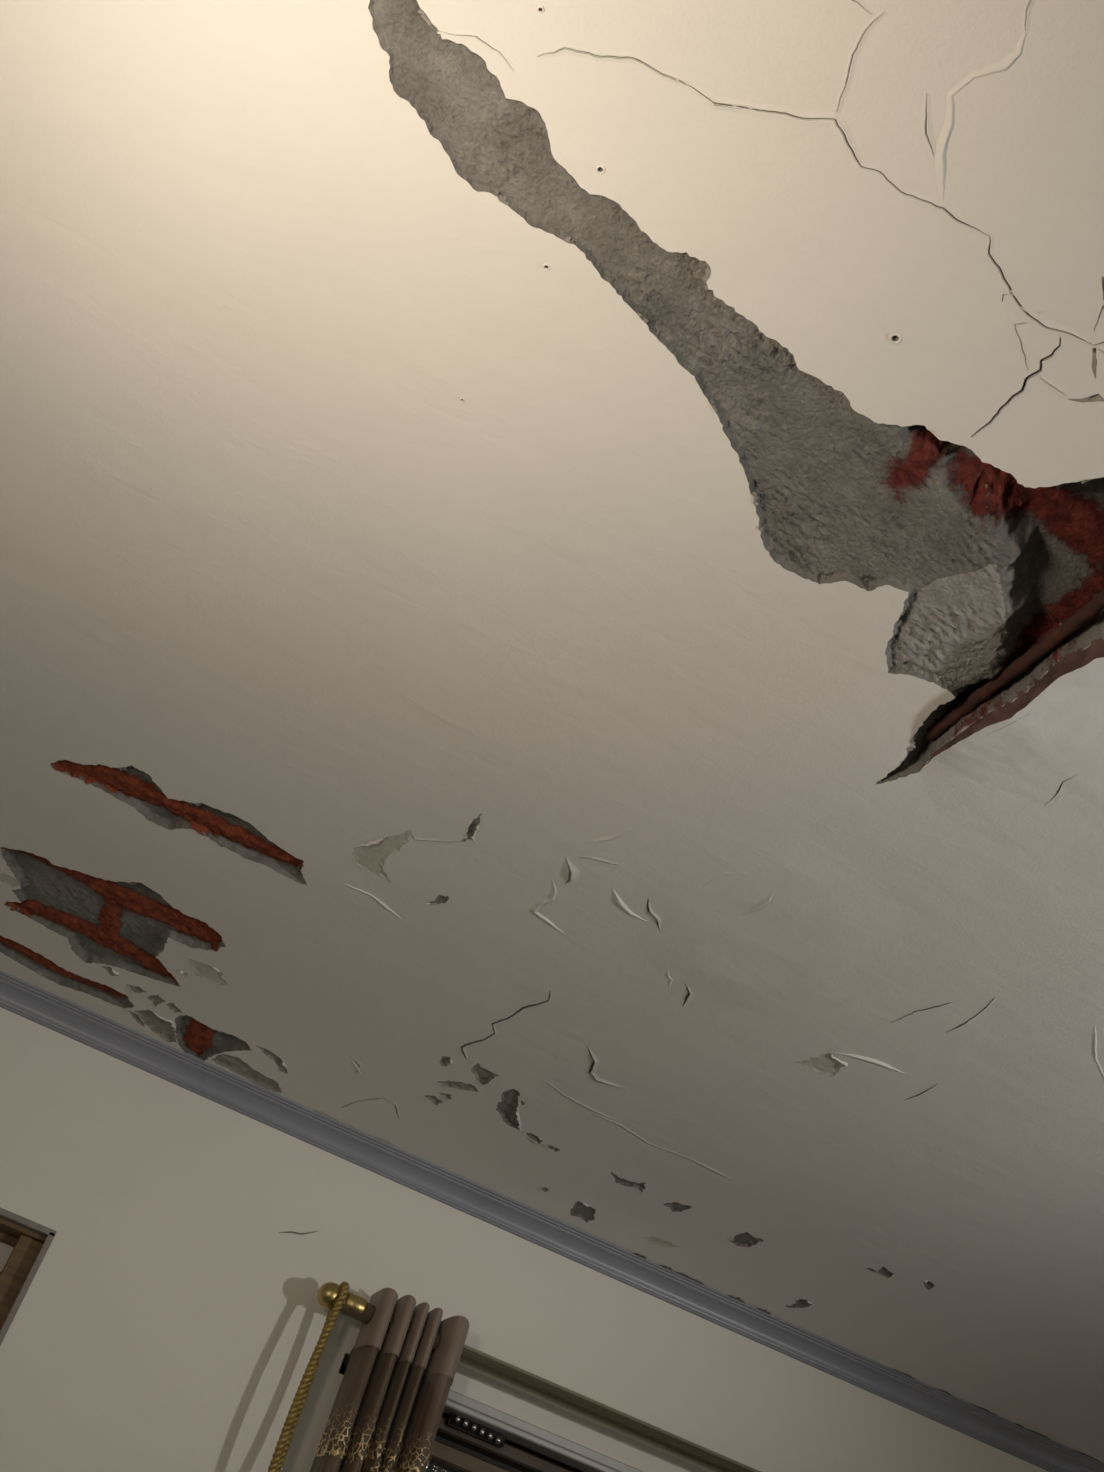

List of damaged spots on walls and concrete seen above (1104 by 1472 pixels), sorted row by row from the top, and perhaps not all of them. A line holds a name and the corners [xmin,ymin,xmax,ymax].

crack [437,0,1104,438]
spalling [368,0,1104,784]
rust [881,425,1104,736]
rust [52,760,302,871]
spalling [50,760,306,885]
peeling [460,814,482,842]
rust [0,935,128,999]
rust [2,848,223,986]
spalling [0,847,288,1093]
peeling [425,1056,560,1152]
peeling [570,1201,596,1222]
peeling [729,1231,764,1247]